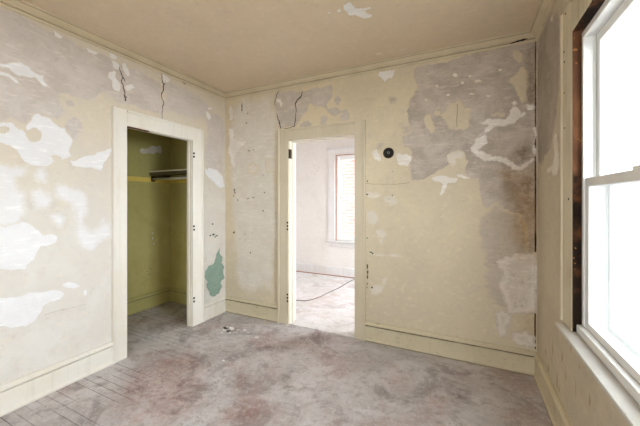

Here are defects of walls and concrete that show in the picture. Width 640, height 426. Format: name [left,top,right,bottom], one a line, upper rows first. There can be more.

spalling [327,2,372,19]
crack [119,67,127,101]
crack [274,91,303,129]
peeling [0,8,350,299]
peeling [372,139,386,161]
peeling [396,8,560,348]
peeling [0,281,88,329]